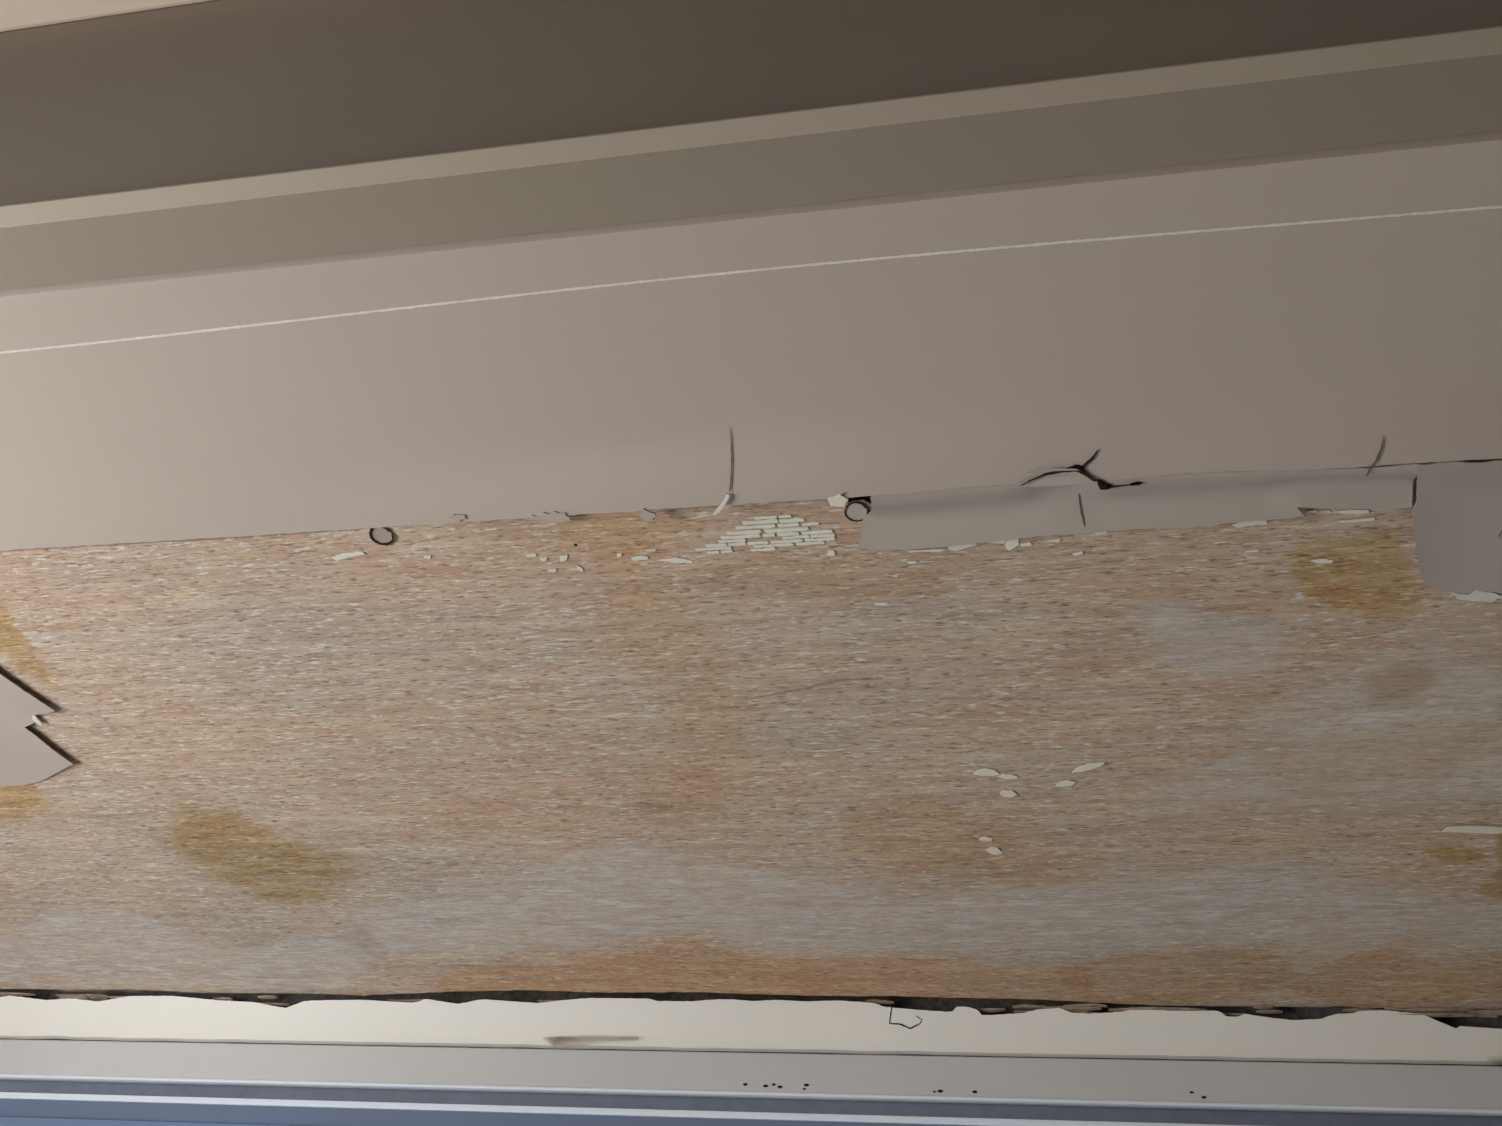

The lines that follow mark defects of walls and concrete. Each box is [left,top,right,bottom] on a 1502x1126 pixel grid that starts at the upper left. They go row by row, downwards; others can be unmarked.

crack [1020,449,1143,490]
crack [1366,436,1384,477]
peeling [332,552,365,561]
peeling [617,514,835,563]
peeling [858,460,1502,602]
peeling [0,673,74,786]
water stain [1208,657,1502,799]
peeling [973,768,1019,798]
peeling [1055,762,1105,787]
peeling [1443,826,1502,834]
water stain [0,849,1502,989]
crack [0,989,1502,1055]